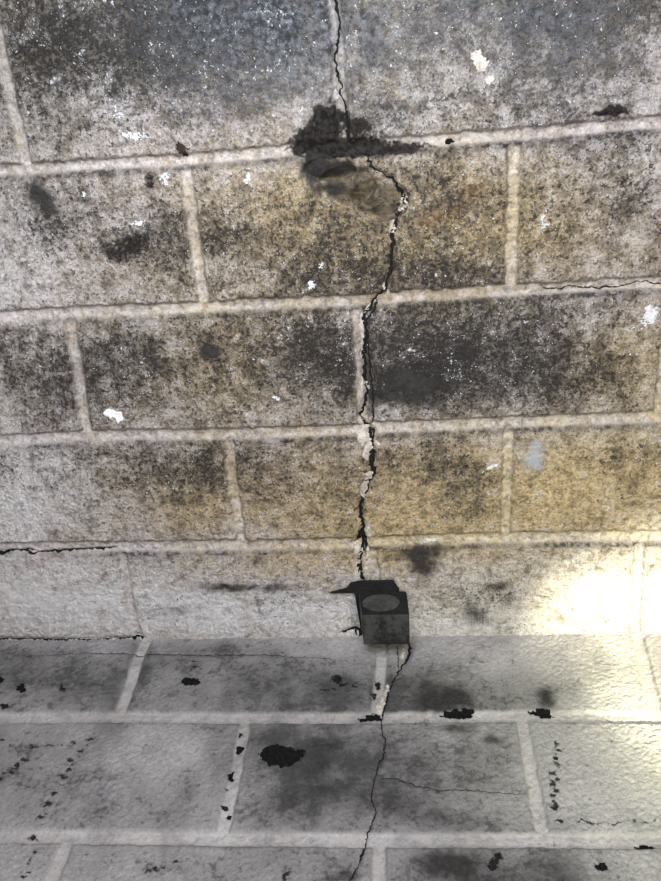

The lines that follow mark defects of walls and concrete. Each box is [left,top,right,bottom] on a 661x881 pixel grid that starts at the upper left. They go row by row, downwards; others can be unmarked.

damp [109,97,151,142]
crack [334,0,409,580]
crack [542,280,661,290]
crack [343,626,363,636]
crack [349,644,521,881]